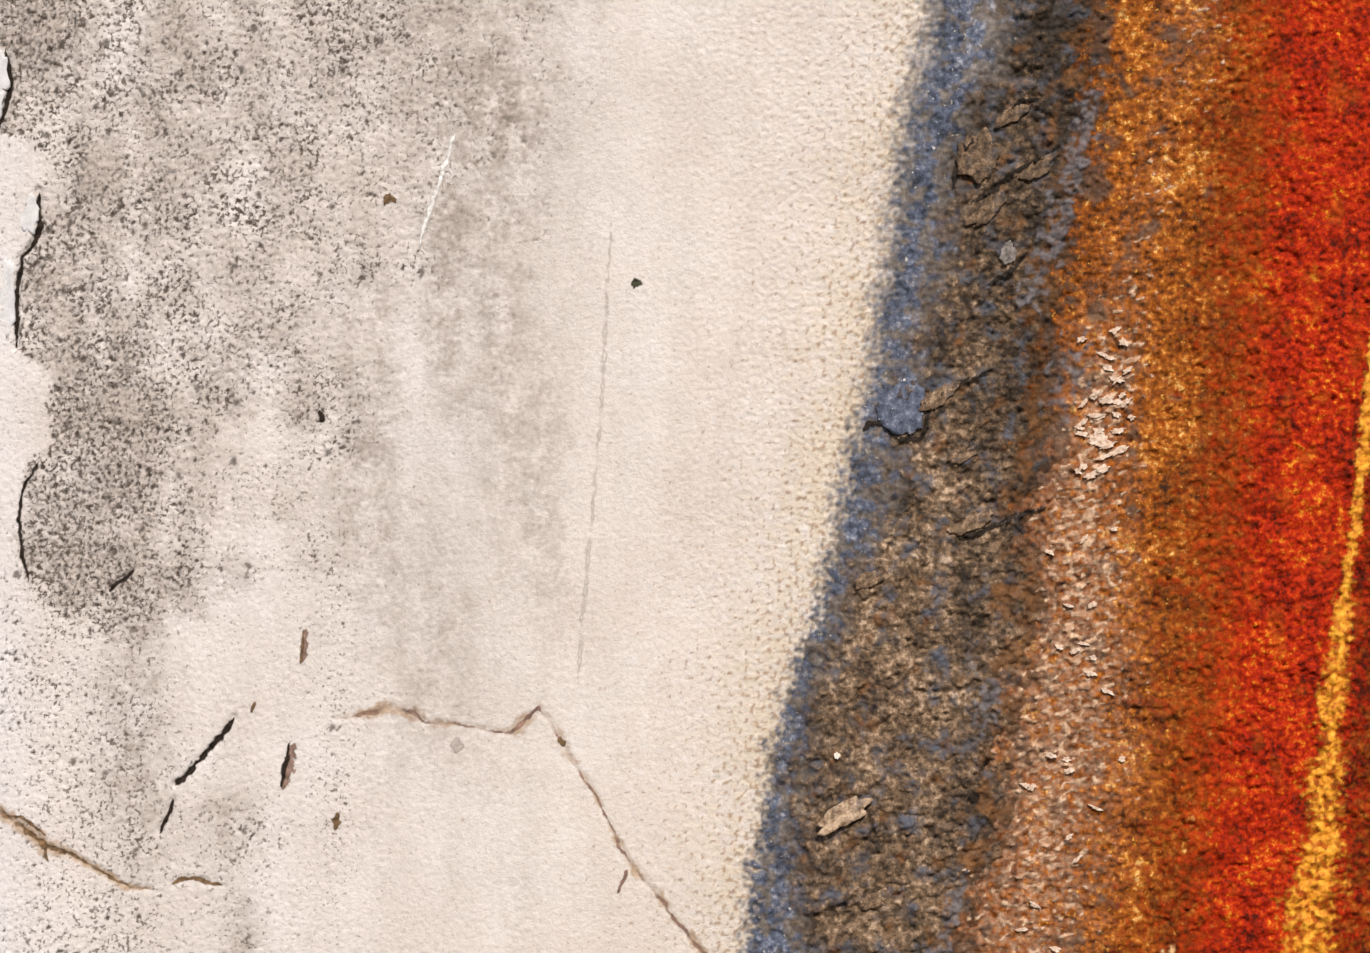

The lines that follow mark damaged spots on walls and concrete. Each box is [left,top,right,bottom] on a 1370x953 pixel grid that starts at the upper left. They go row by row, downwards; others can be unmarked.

peeling [0,50,11,119]
peeling [20,193,40,236]
peeling [0,257,16,339]
flaking render [780,0,1114,953]
corrosion [942,0,1370,953]
crack [356,703,561,738]
crack [160,702,256,833]
crack [0,806,222,890]
crack [579,771,707,953]